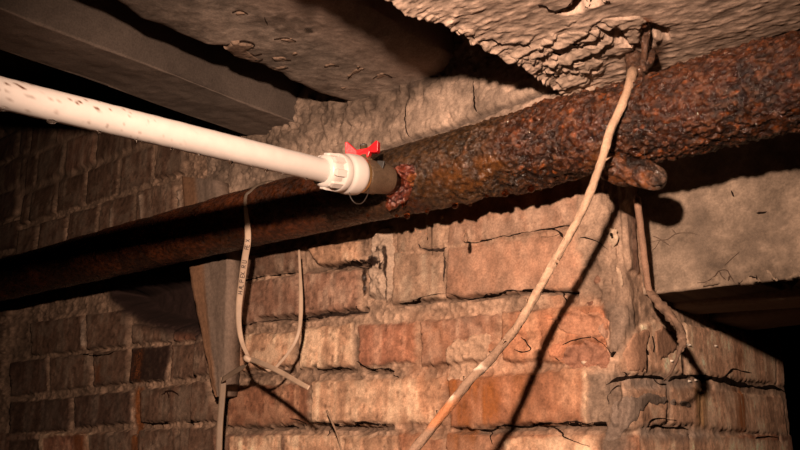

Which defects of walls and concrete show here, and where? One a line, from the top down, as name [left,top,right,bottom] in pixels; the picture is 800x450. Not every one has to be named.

peeling [450,24,492,53]
spalling [502,16,651,96]
corrosion [625,18,662,75]
corrosion [384,164,417,211]
corrosion [425,151,504,198]
crack [464,225,607,249]
crack [335,259,370,270]
crack [400,244,579,305]
spalling [641,263,659,292]
spalling [623,326,678,372]
crack [556,336,785,403]